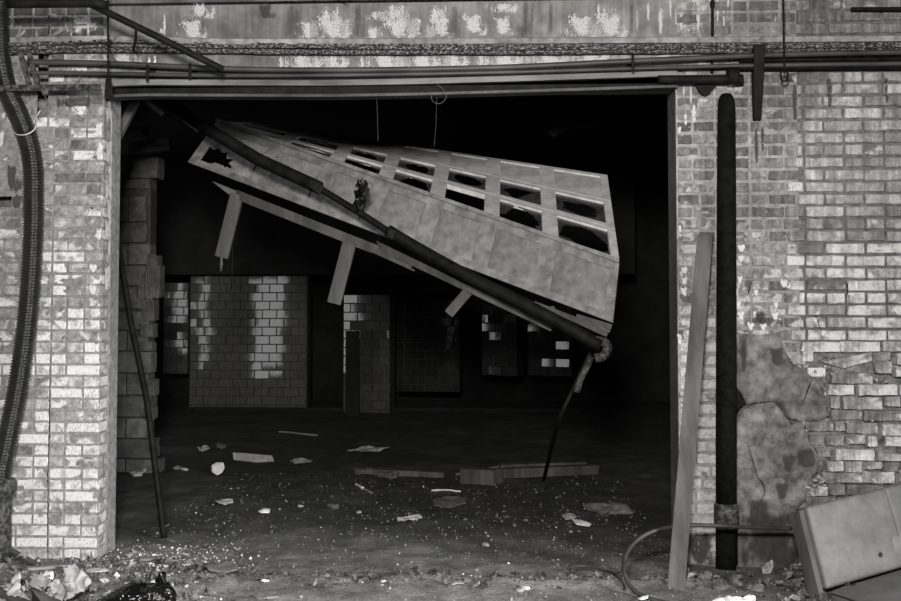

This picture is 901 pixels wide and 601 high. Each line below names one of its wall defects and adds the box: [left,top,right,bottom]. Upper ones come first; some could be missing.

peeling [295,3,517,38]
peeling [564,8,629,37]
peeling [279,54,349,67]
peeling [360,54,609,67]
flaking render [737,389,746,414]
crack [748,380,812,425]
spalling [800,341,901,506]